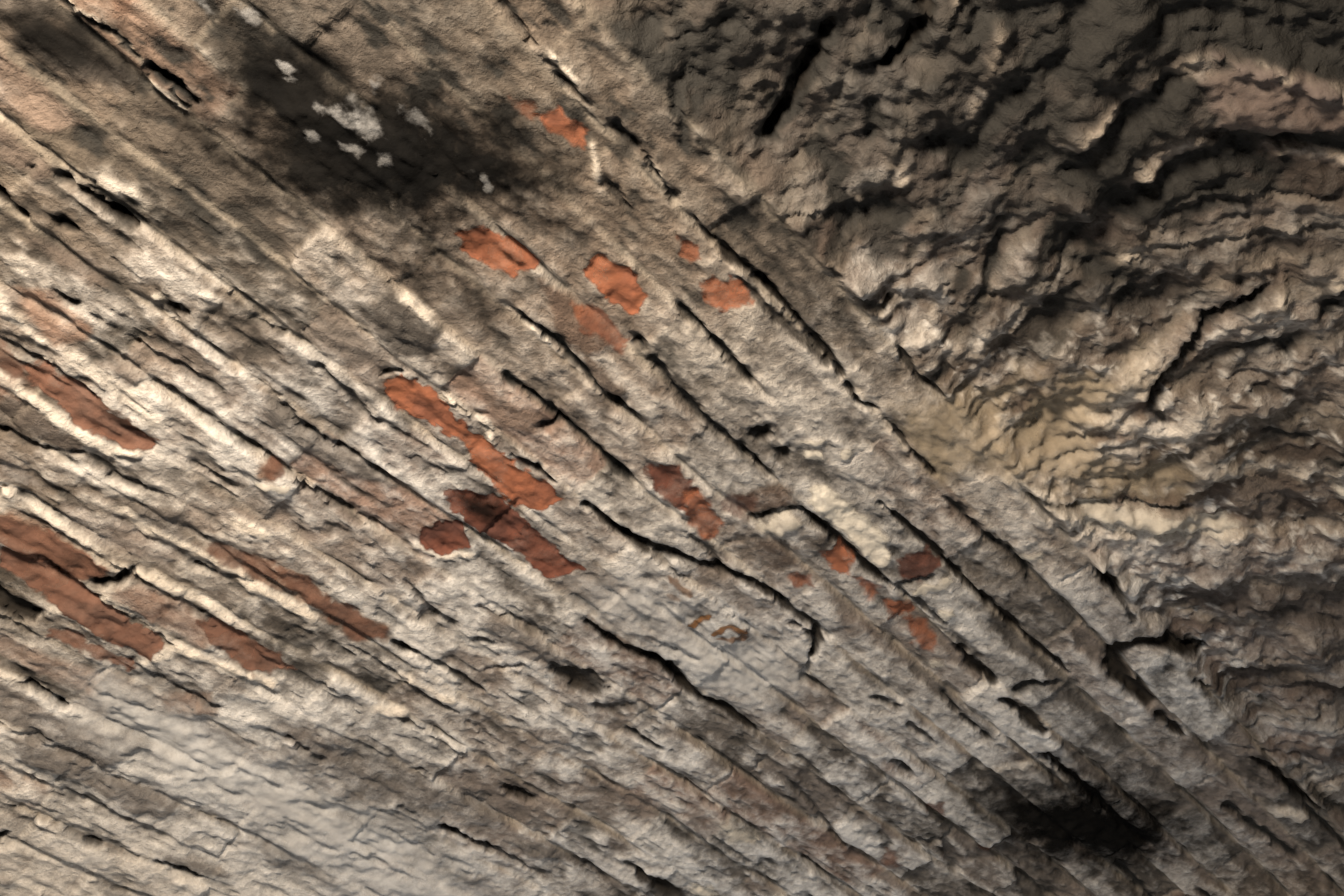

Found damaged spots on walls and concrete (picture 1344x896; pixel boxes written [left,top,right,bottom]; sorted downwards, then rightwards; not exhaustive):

spalling [455,225,539,278]
spalling [575,254,648,352]
spalling [702,278,753,312]
spalling [23,360,160,451]
spalling [384,375,586,578]
crack [511,452,554,480]
spalling [643,464,723,539]
spalling [0,517,164,672]
spalling [196,617,297,672]
spalling [280,573,386,641]
crack [581,500,824,654]
peeling [810,486,952,649]